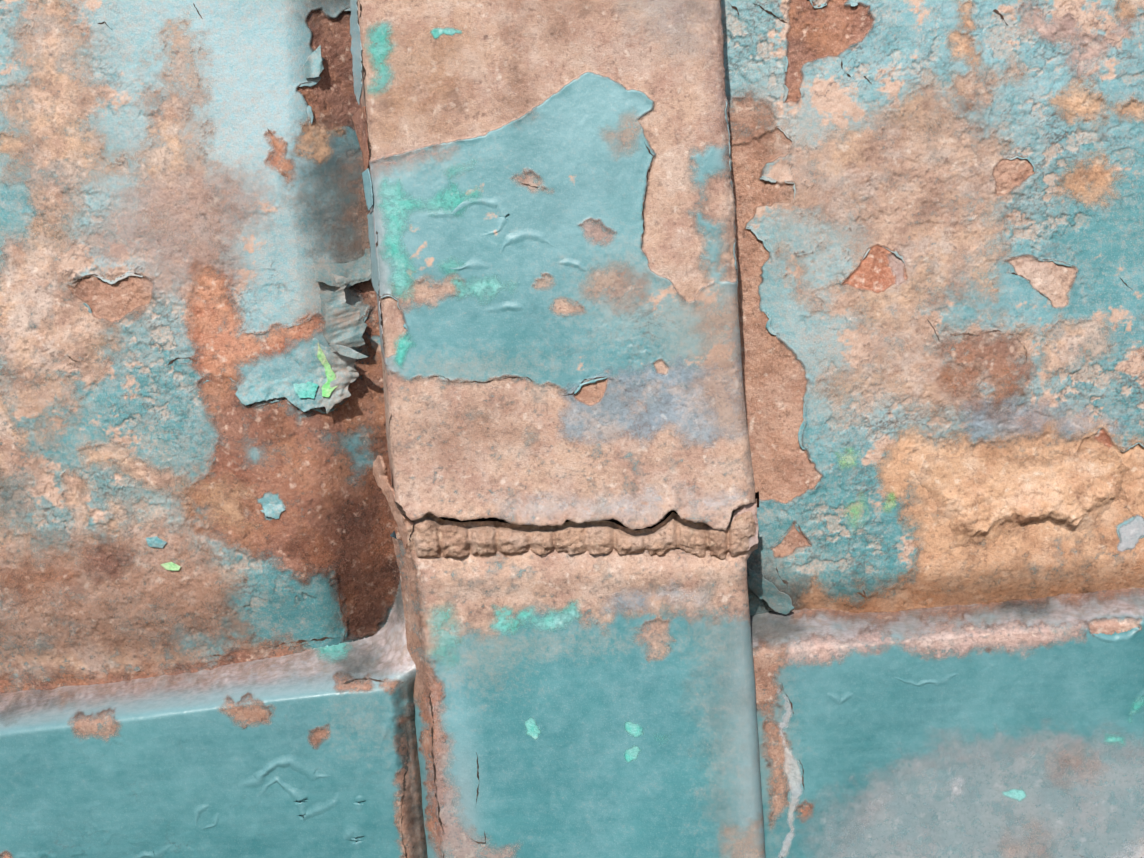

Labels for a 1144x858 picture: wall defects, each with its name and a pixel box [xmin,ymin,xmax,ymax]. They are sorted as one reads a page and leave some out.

peeling [783,0,874,102]
rust [717,2,1113,421]
peeling [68,271,153,322]
peeling [235,0,822,551]
peeling [844,245,907,293]
peeling [1008,255,1077,308]
rust [0,0,755,858]
crack [395,502,531,541]
crack [608,510,702,531]
peeling [747,567,794,615]
rust [753,413,1144,818]
peeling [1088,619,1141,635]